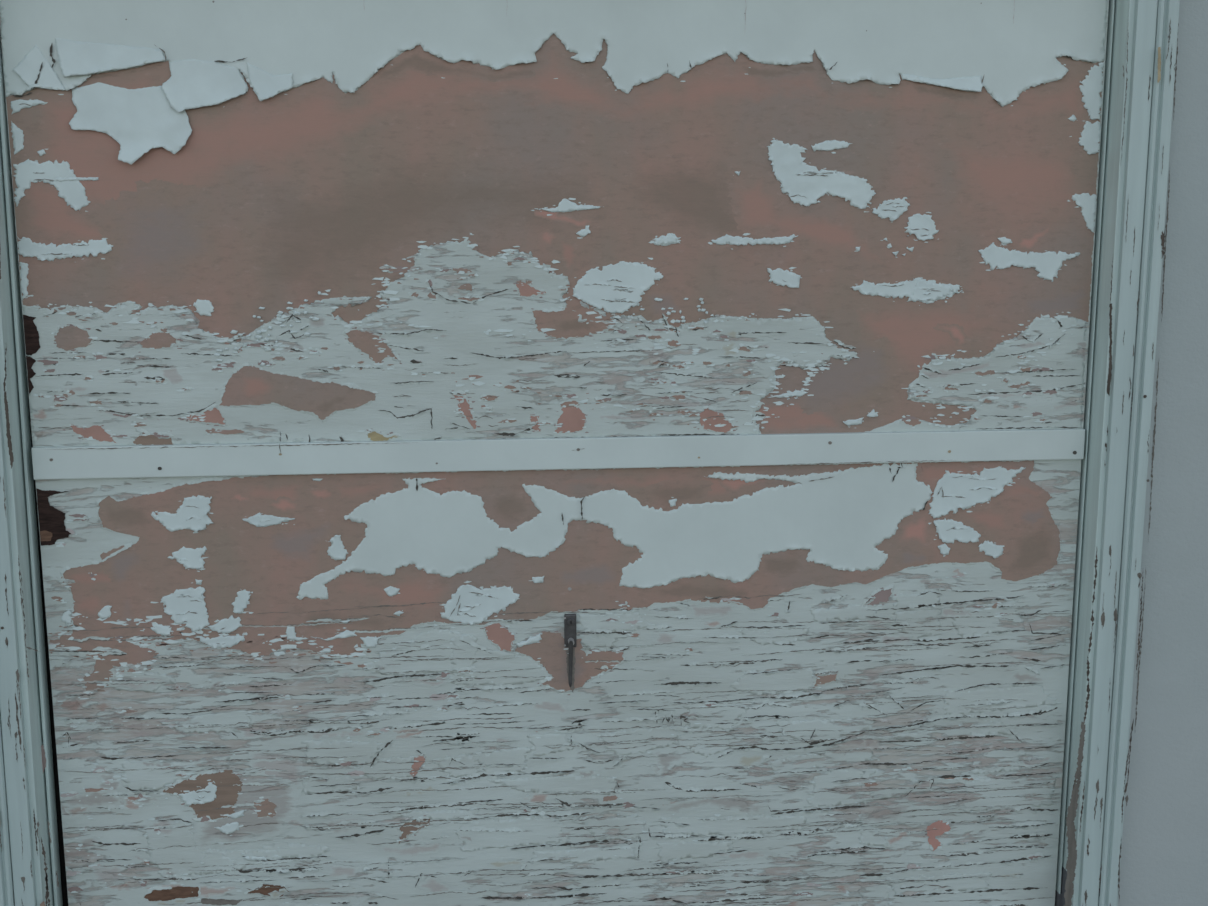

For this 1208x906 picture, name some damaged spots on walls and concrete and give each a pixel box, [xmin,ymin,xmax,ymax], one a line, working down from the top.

peeling [371,45,463,78]
peeling [6,88,379,445]
peeling [300,51,1105,441]
crack [782,460,994,510]
crack [0,552,1146,906]